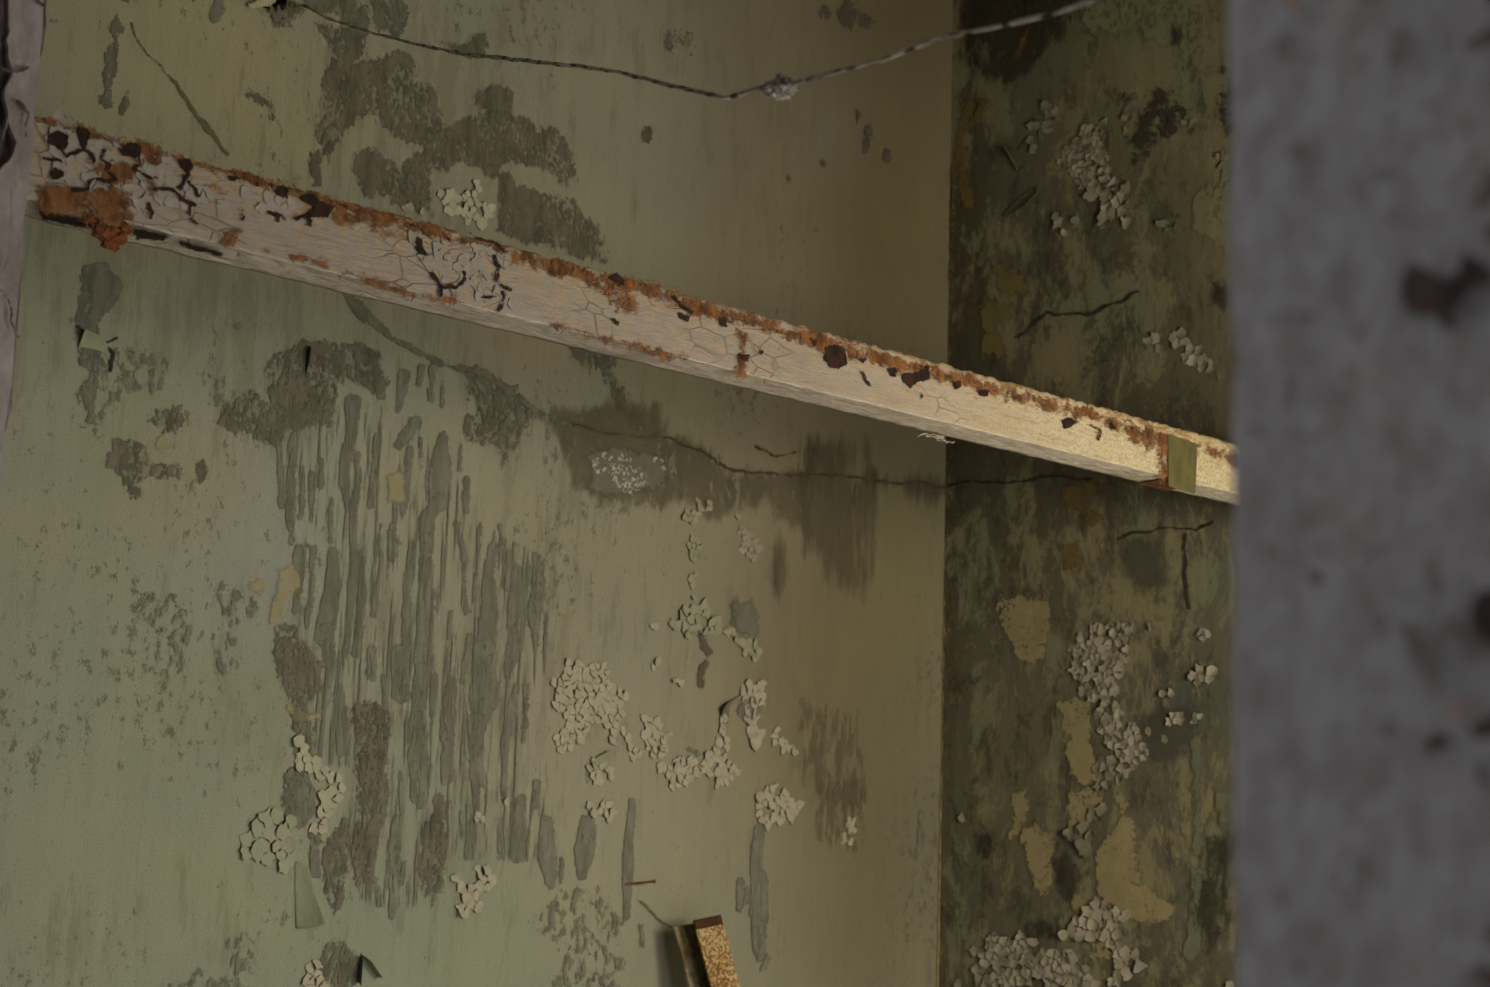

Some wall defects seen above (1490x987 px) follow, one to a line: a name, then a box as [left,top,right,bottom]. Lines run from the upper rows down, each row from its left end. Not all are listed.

peeling [0,0,43,482]
peeling [98,0,130,116]
peeling [72,262,208,500]
peeling [246,0,609,265]
corrosion [37,116,1169,486]
leakage [960,0,1077,83]
leakage [1125,86,1188,168]
corrosion [1197,432,1233,467]
peeling [202,338,805,987]
peeling [841,816,857,846]
peeling [954,594,1203,987]
peeling [1188,660,1218,687]